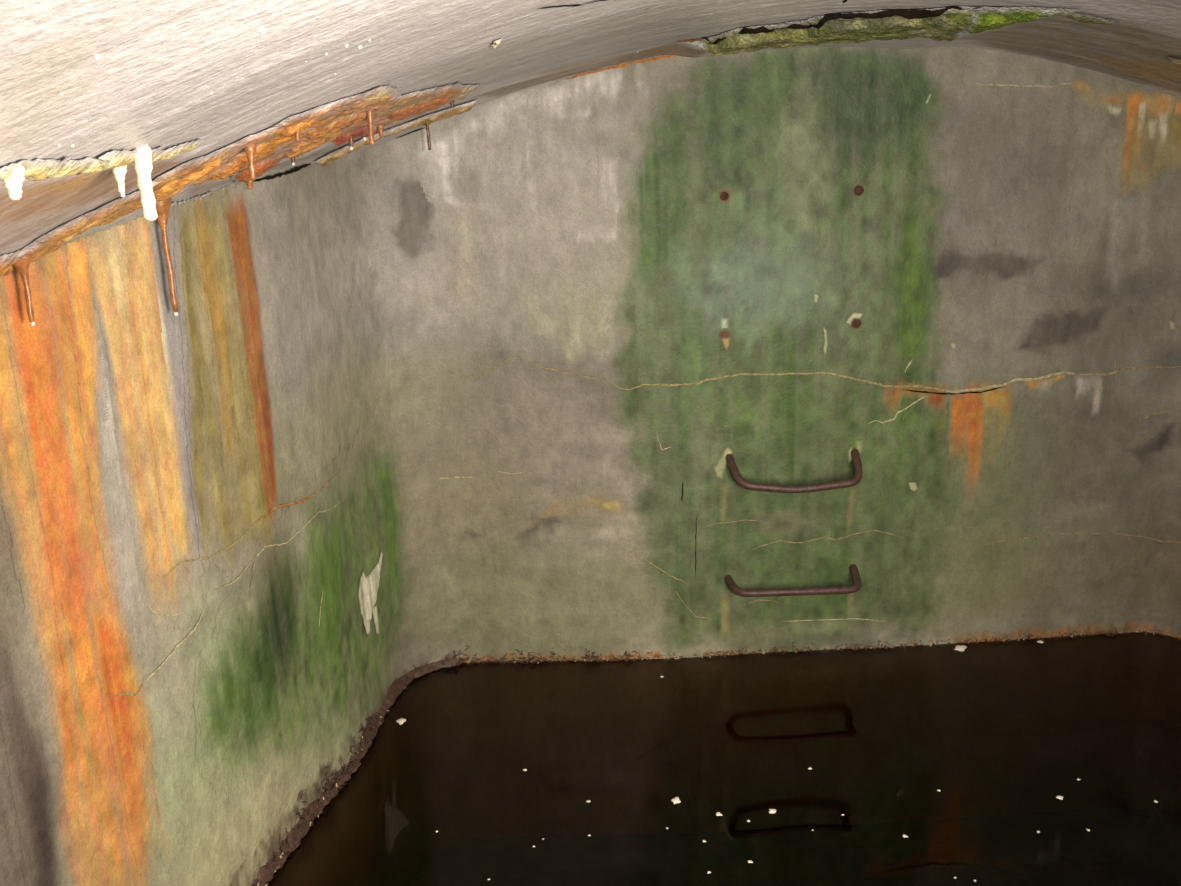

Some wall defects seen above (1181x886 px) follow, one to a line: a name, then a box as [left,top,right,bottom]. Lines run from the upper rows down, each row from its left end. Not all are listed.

damp [0,62,652,329]
crack [537,0,607,10]
crack [566,0,1004,79]
damp [1006,153,1128,360]
rust [1067,74,1181,205]
rust [0,184,280,886]
crack [114,468,346,696]
damp [197,493,349,783]
damp [372,431,409,632]
crack [460,357,1181,424]
rust [882,371,1067,508]
damp [951,618,1181,649]